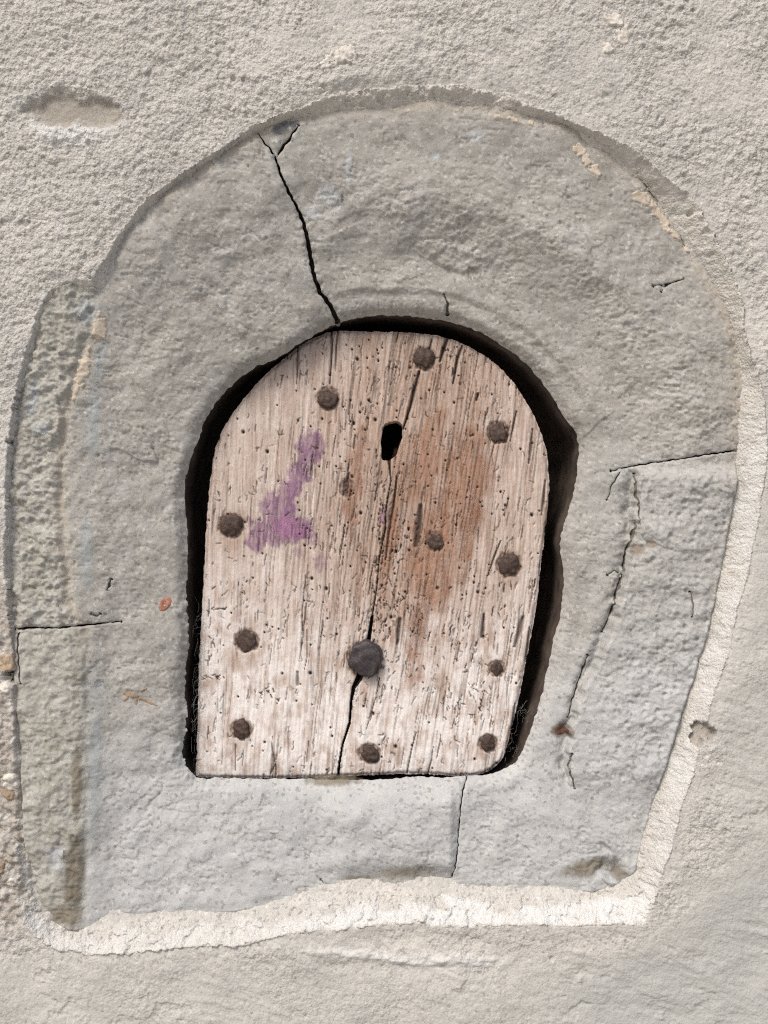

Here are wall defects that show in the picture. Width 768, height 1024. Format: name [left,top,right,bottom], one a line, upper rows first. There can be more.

crack [255,124,342,323]
crack [600,447,737,633]
crack [14,579,122,683]
crack [566,655,590,717]
crack [563,753,578,788]
crack [448,776,470,879]